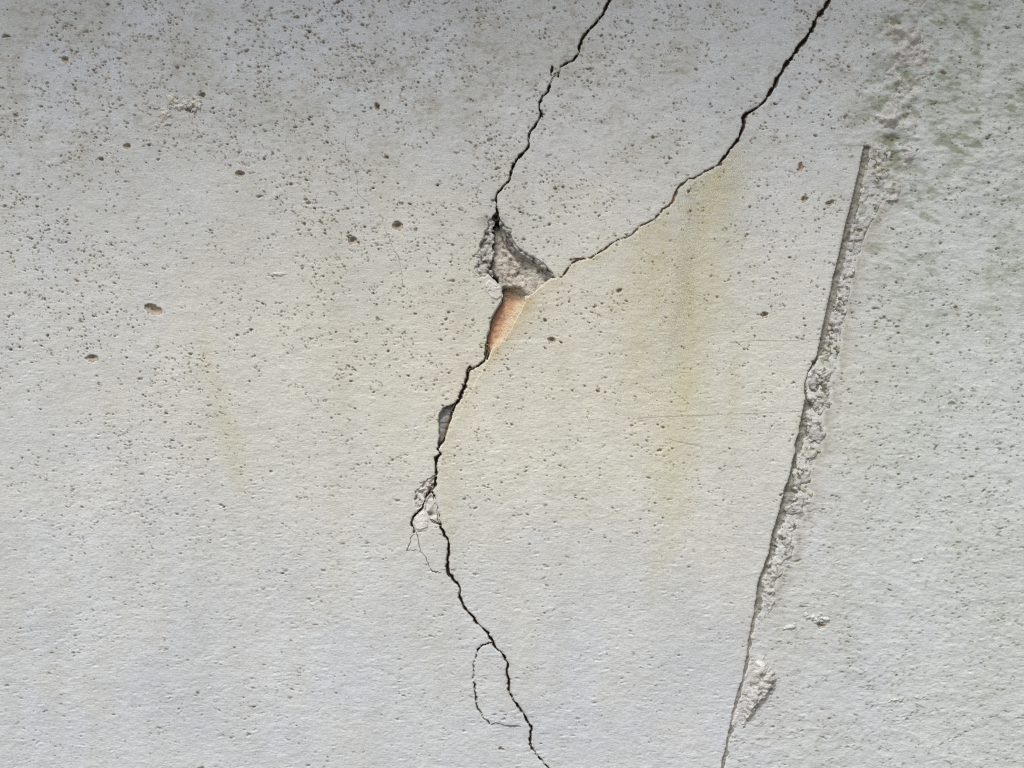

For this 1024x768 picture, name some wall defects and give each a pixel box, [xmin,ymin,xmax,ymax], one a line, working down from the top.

crack [492,0,612,222]
crack [551,0,831,278]
spalling [474,219,554,360]
crack [406,344,547,766]